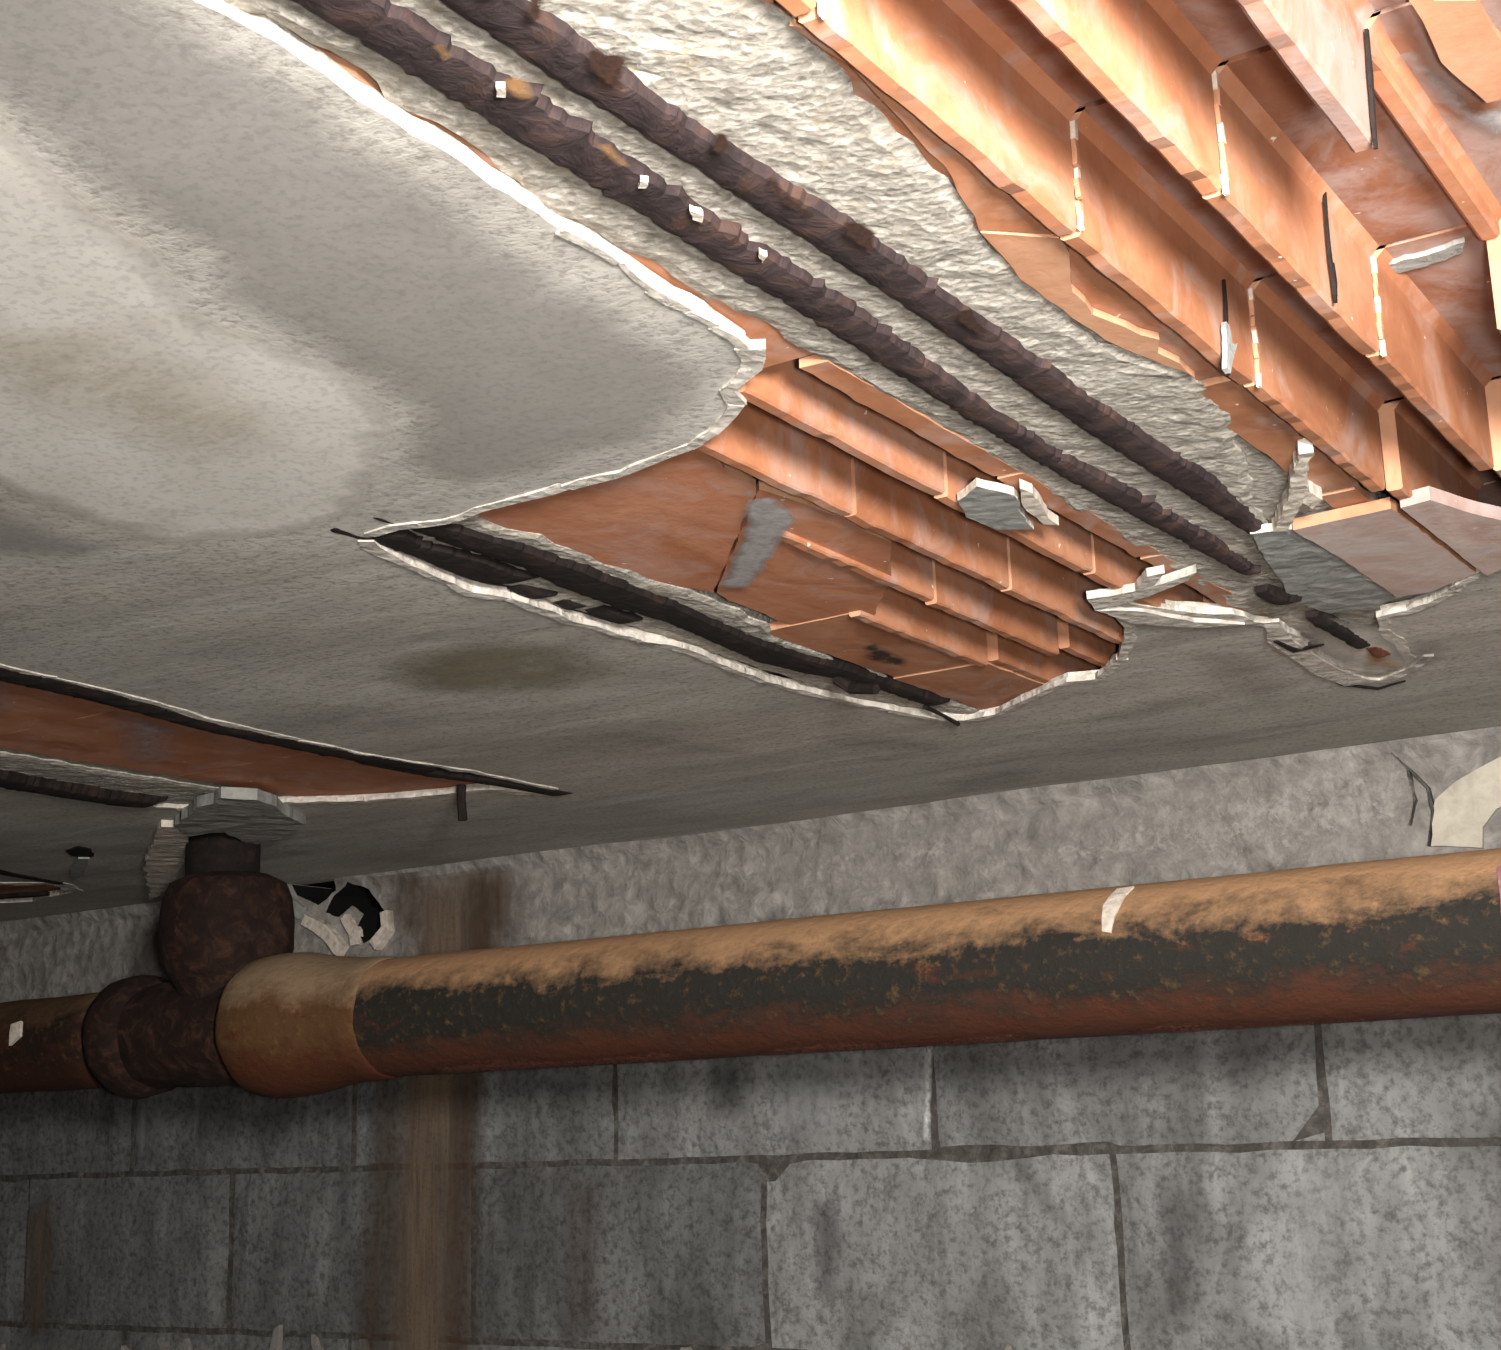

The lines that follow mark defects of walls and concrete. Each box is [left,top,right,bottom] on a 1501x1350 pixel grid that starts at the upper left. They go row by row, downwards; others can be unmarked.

rust [528,0,543,19]
rust [505,78,528,95]
rust [589,50,626,89]
rust [713,134,730,154]
rust [766,178,813,218]
rust [845,223,876,251]
rust [957,310,988,334]
spalling [291,0,1484,722]
spalling [0,663,572,811]
peeling [1431,757,1501,849]
spalling [0,846,94,891]